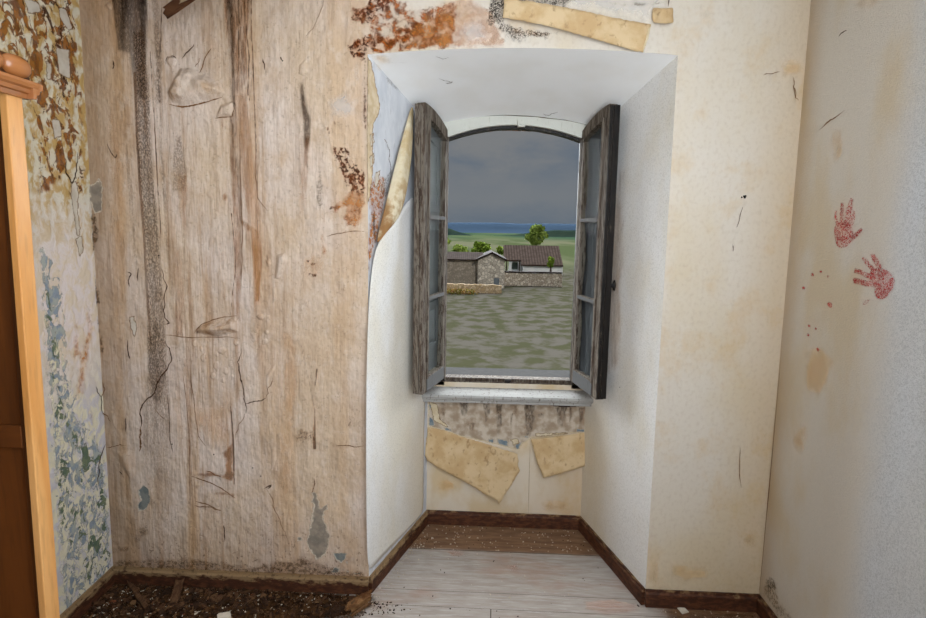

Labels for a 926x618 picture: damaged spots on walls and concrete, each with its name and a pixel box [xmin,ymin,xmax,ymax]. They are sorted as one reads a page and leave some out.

leakage [113,0,160,196]
peeling [367,58,380,202]
peeling [40,248,110,608]
flaking render [137,485,150,511]
crack [97,271,273,484]
flaking render [297,492,362,576]
flaking render [428,402,585,449]